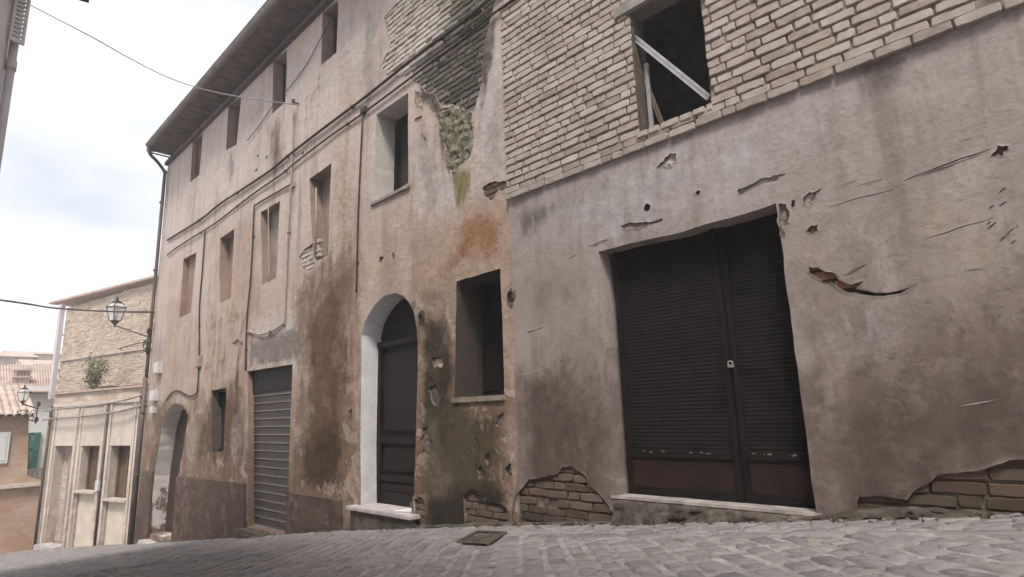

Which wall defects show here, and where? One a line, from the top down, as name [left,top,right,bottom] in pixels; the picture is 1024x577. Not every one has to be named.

leakage [421,87,440,121]
flaking render [380,0,497,173]
leakage [454,170,469,205]
flaking render [736,172,787,195]
flaking render [777,185,824,238]
crack [855,148,991,187]
flaking render [988,143,1011,159]
leakage [304,294,346,485]
leakage [424,323,453,456]
leakage [428,490,503,525]
flaking render [463,452,614,523]
flaking render [852,455,1024,514]